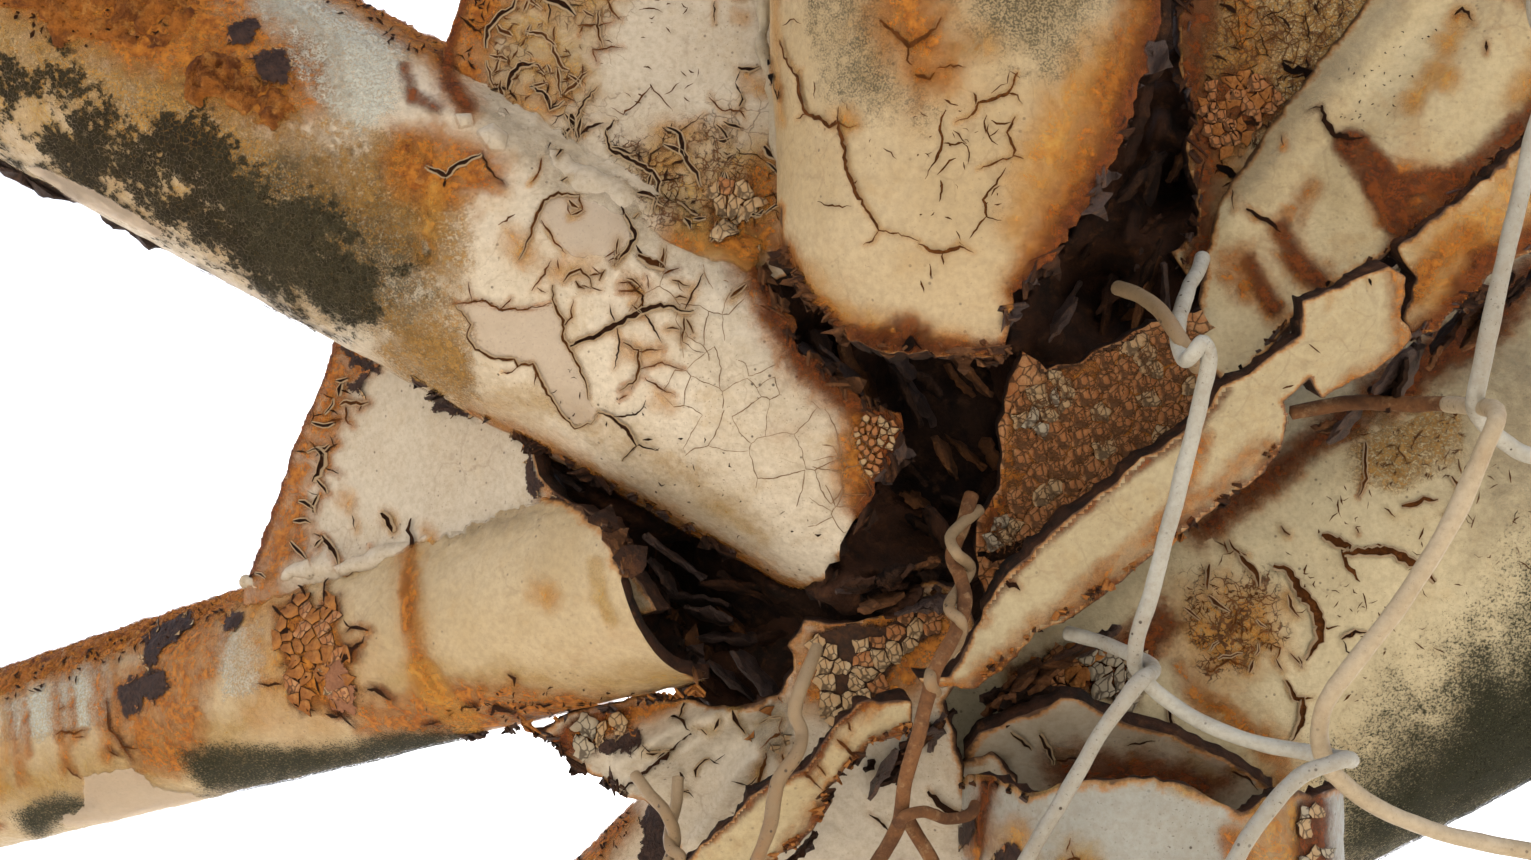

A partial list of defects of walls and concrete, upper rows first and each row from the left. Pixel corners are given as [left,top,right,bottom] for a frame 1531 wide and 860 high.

corrosion [0,0,323,131]
water stain [0,0,479,400]
corrosion [0,325,511,777]
water stain [249,399,315,578]
crack [249,377,635,728]
peeling [636,804,666,860]
crack [326,0,1024,538]
corrosion [343,0,1366,741]
spalling [863,707,958,801]
peeling [797,150,1198,727]
corrosion [788,100,1531,782]
crack [1184,412,1531,742]